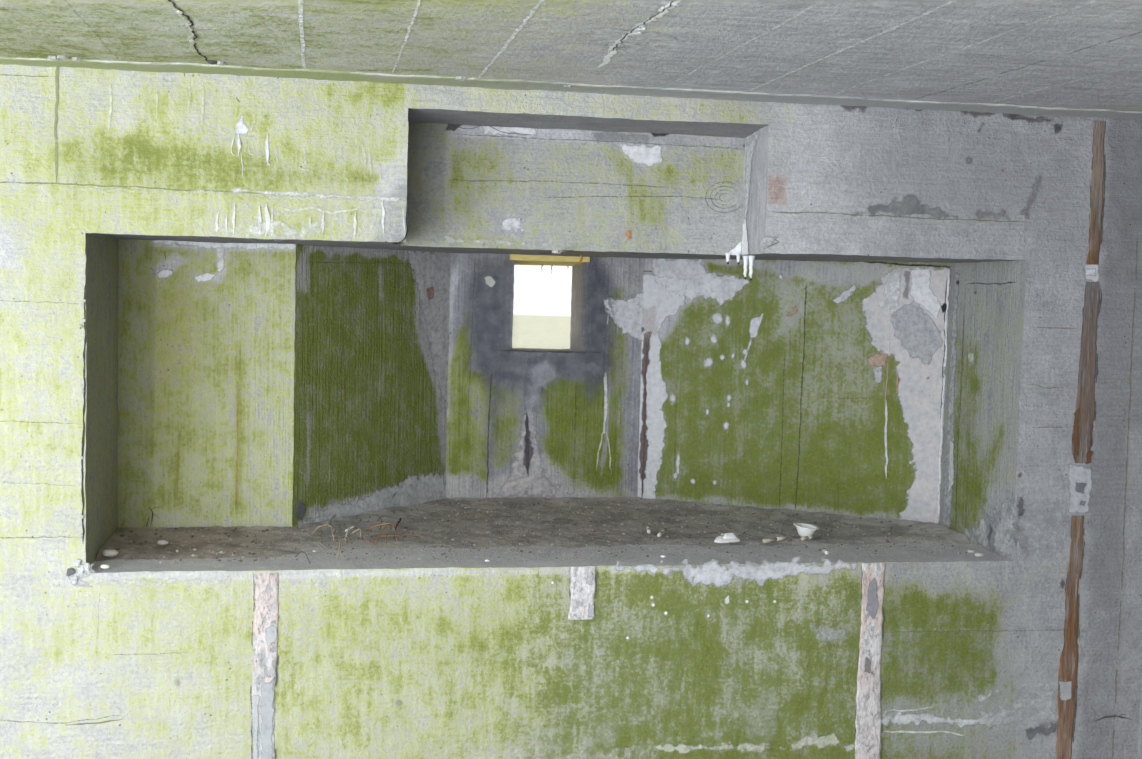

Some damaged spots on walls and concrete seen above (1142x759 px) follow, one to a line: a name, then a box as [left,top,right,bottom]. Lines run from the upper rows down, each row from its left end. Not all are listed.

crack [168,0,208,76]
water stain [151,116,399,282]
water stain [596,373,620,470]
peeling [833,266,974,528]
water stain [557,733,854,759]
water stain [882,687,1059,739]